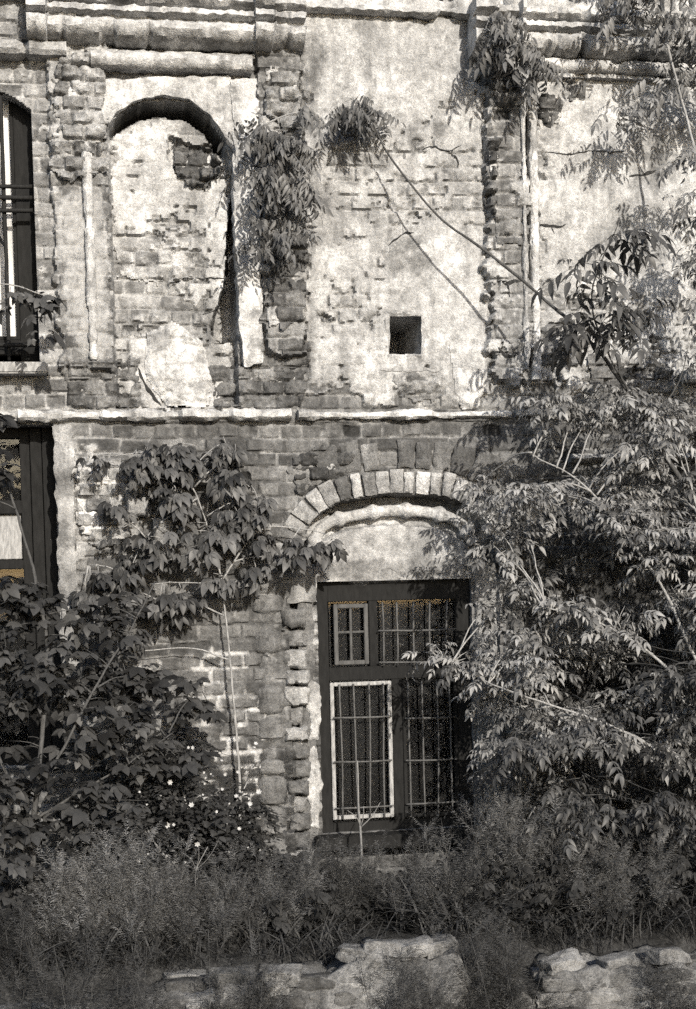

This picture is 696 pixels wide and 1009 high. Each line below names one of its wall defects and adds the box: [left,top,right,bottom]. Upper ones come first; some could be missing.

spalling [49,51,110,183]
flaking render [172,138,222,189]
spalling [483,137,523,245]
flaking render [113,241,195,286]
crack [183,197,231,344]
spalling [392,373,442,402]